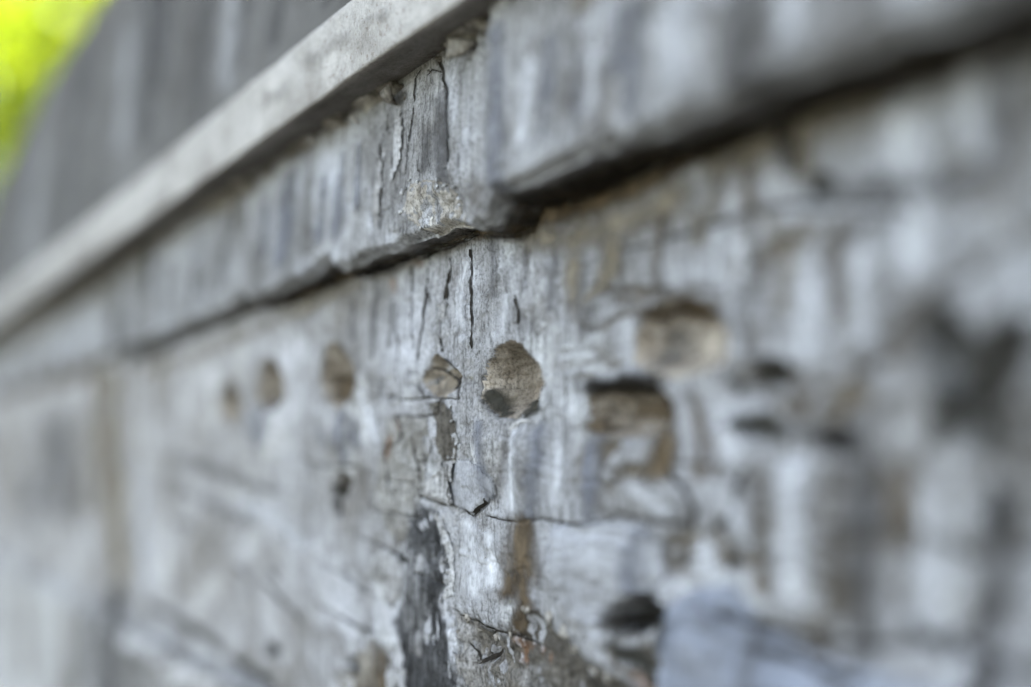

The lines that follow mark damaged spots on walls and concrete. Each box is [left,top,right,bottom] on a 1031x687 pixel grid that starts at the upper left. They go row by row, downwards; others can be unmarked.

crack [377,62,448,235]
crack [370,249,748,571]
crack [355,535,448,584]
spalling [337,401,631,687]
crack [453,609,553,664]